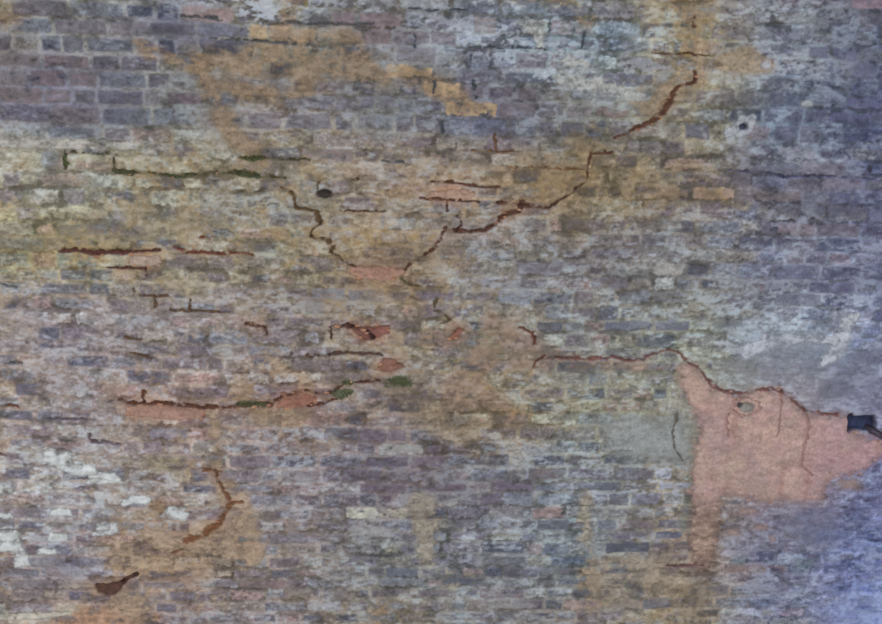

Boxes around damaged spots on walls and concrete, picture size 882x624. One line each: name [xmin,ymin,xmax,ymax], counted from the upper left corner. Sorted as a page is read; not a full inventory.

crack [64,150,386,267]
crack [399,52,704,324]
crack [58,236,254,313]
crack [124,335,152,359]
crack [244,322,268,335]
crack [305,323,383,358]
crack [118,379,380,409]
spalling [676,364,882,572]
crack [171,468,244,554]